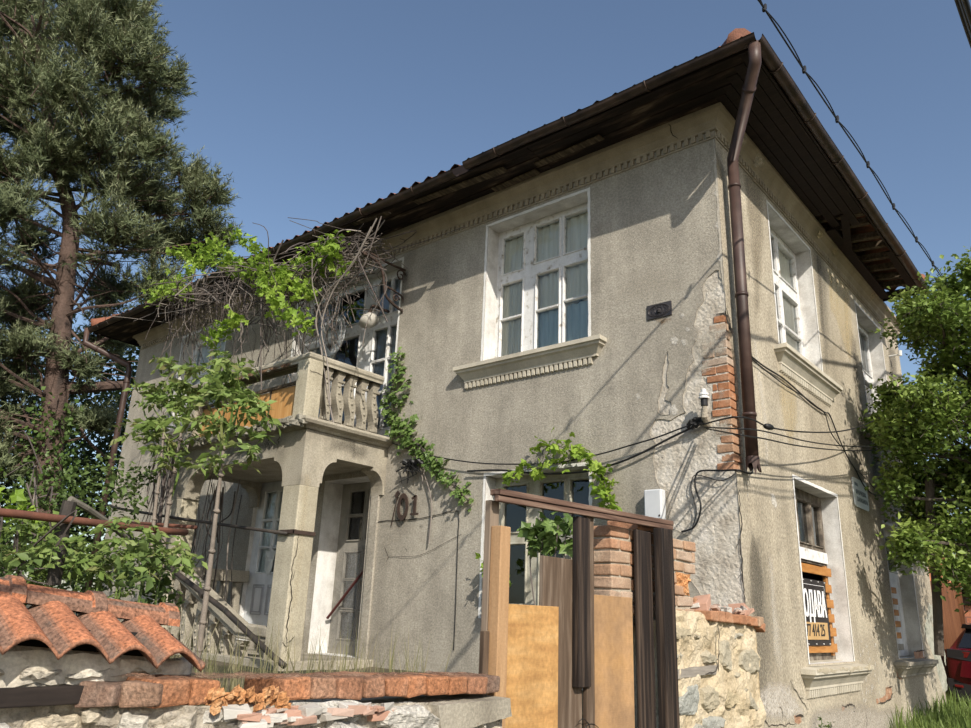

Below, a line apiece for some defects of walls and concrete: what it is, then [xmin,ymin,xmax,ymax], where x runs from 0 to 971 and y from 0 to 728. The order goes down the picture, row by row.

flaking render [650,139,745,607]
crack [282,534,299,653]
crack [765,681,807,727]
flaking render [761,673,902,728]